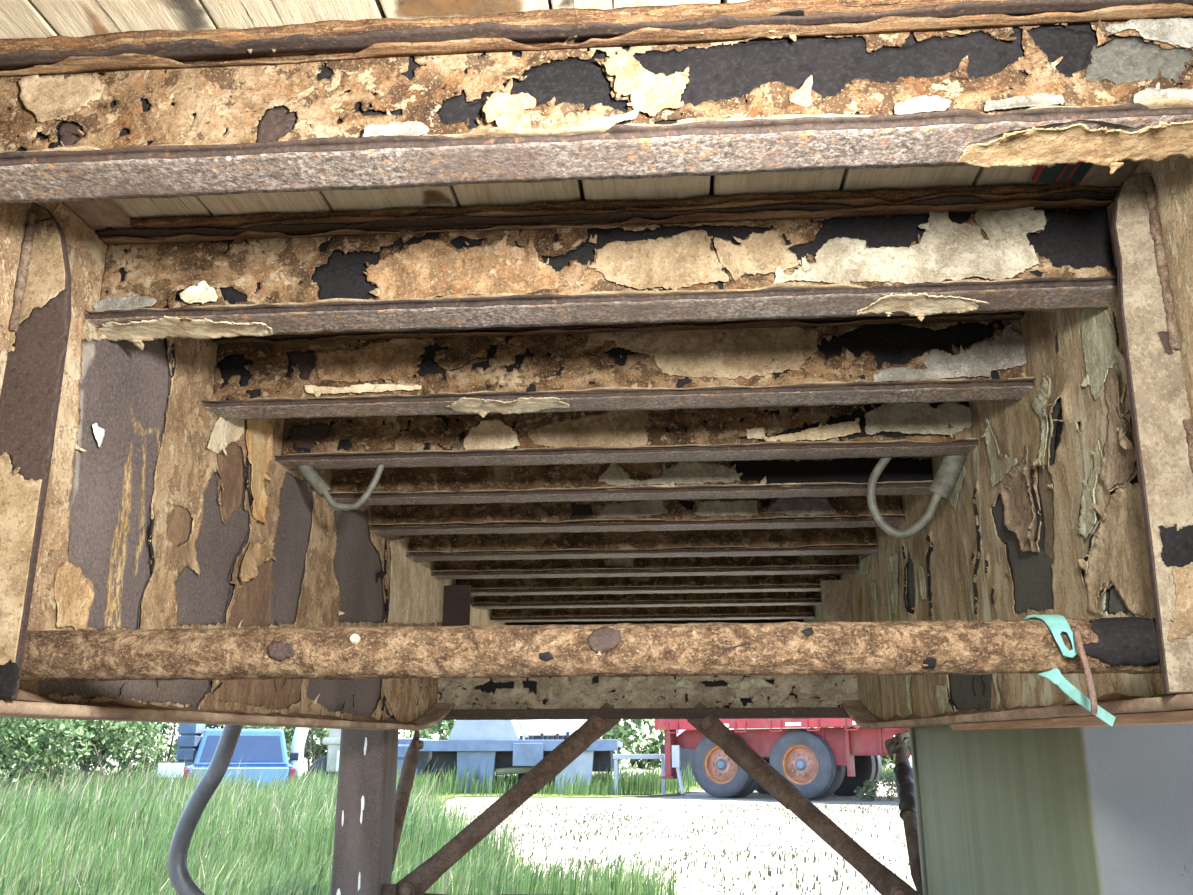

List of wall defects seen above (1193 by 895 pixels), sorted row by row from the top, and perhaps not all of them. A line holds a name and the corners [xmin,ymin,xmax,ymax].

peeling [18,73,105,147]
peeling [437,49,639,129]
peeling [633,18,1193,123]
corrosion [956,120,1193,175]
peeling [542,207,1115,290]
peeling [0,290,70,482]
peeling [819,322,1027,381]
peeling [68,338,173,630]
peeling [167,417,315,662]
peeling [570,457,934,520]
peeling [746,374,1063,615]
peeling [1083,525,1193,667]